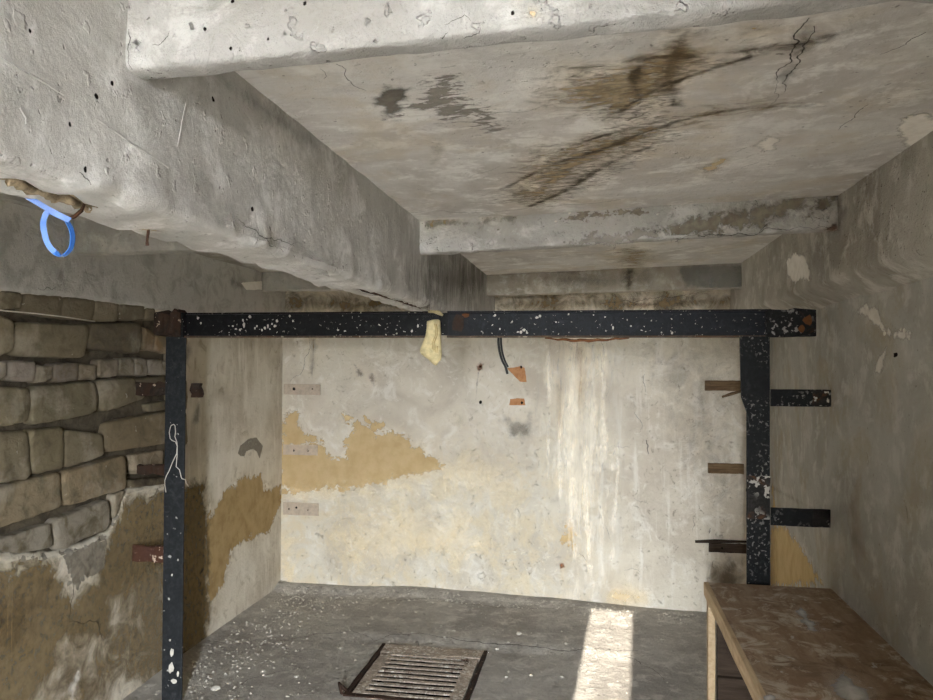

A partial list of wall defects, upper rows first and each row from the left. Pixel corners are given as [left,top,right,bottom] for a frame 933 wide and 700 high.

crack [774,18,815,95]
water stain [374,75,504,133]
water stain [509,111,725,206]
spalling [555,207,658,222]
flaking render [787,252,810,281]
flaking render [0,291,166,700]
flaking render [183,411,446,654]
flaking render [770,525,823,587]